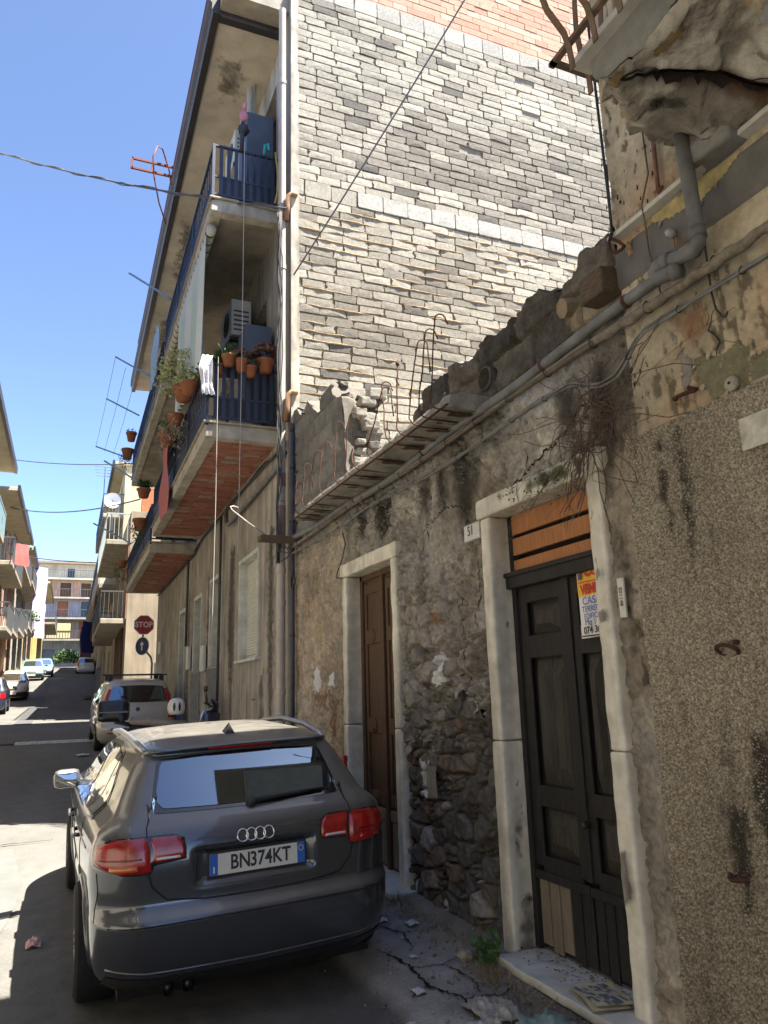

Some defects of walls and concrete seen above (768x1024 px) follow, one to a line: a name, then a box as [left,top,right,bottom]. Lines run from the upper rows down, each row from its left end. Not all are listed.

spalling [652,25,684,56]
peeling [668,331,768,401]
spalling [351,388,472,465]
crack [513,400,589,498]
water stain [658,469,668,507]
peeling [311,666,335,692]
peeling [432,650,481,720]
water stain [730,732,768,885]
crack [378,925,515,1018]